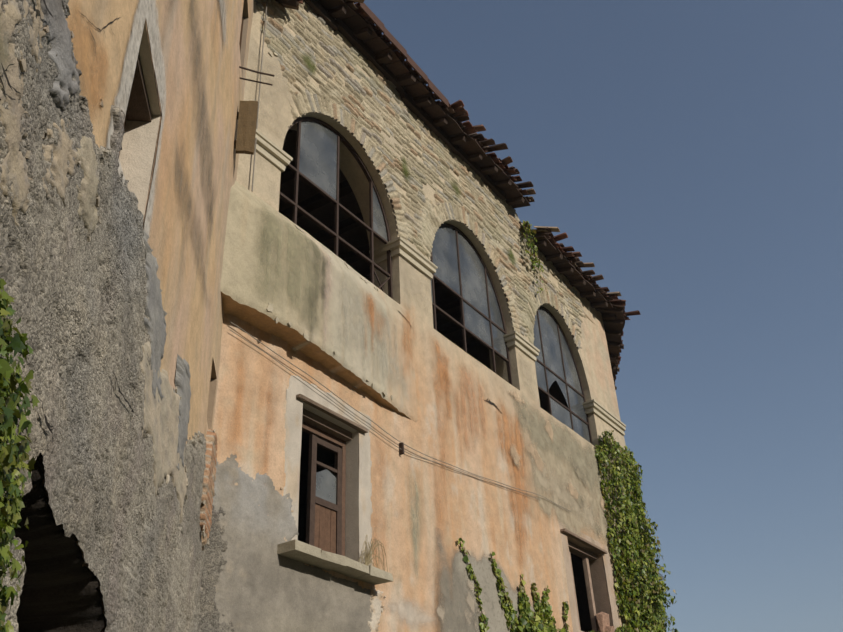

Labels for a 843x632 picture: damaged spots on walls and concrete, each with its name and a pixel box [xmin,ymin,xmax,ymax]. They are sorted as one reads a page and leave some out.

crack [80,13,120,62]
flaking render [0,0,386,632]
flaking render [254,0,596,349]
flaking render [437,549,535,632]